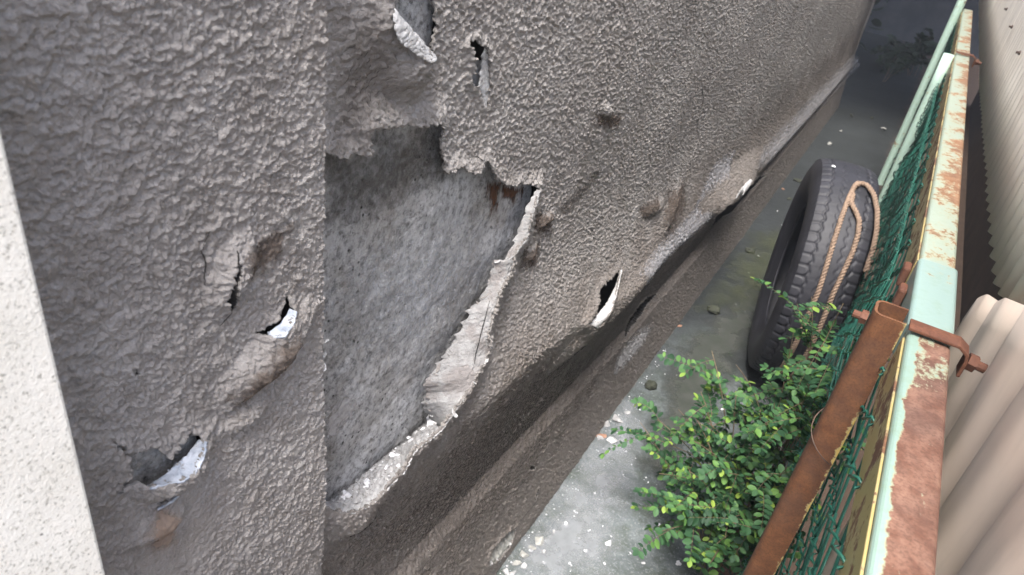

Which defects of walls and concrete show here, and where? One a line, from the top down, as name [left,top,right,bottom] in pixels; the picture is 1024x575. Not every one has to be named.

peeling [392,0,437,73]
peeling [472,48,490,112]
corrosion [486,182,524,217]
crack [201,232,210,285]
crack [221,250,242,325]
peeling [267,308,298,339]
peeling [323,124,541,514]
peeling [590,270,622,329]
peeling [113,435,208,510]